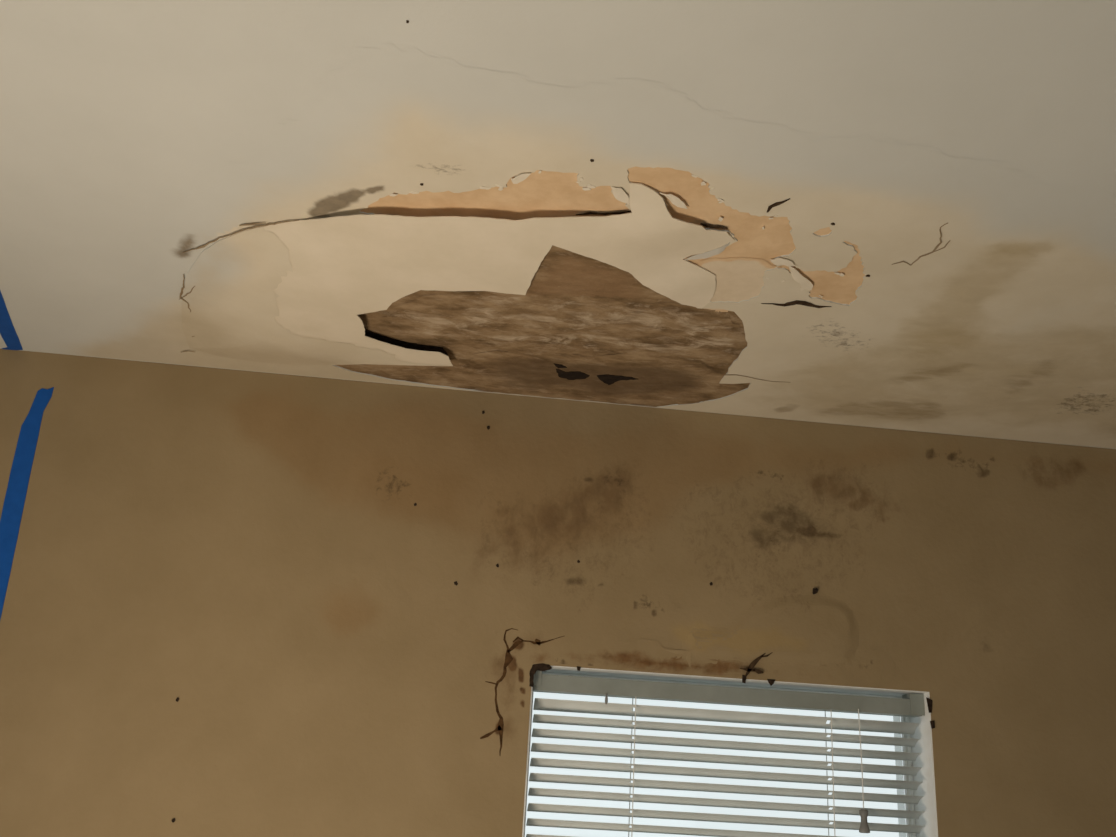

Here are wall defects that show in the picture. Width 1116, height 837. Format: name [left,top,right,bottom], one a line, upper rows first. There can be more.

crack [179,219,308,352]
spalling [365,329,448,356]
damp [20,43,1116,511]
spalling [554,363,637,385]
peeling [361,167,870,312]
crack [892,223,950,266]
damp [152,363,950,772]
crack [480,628,564,754]